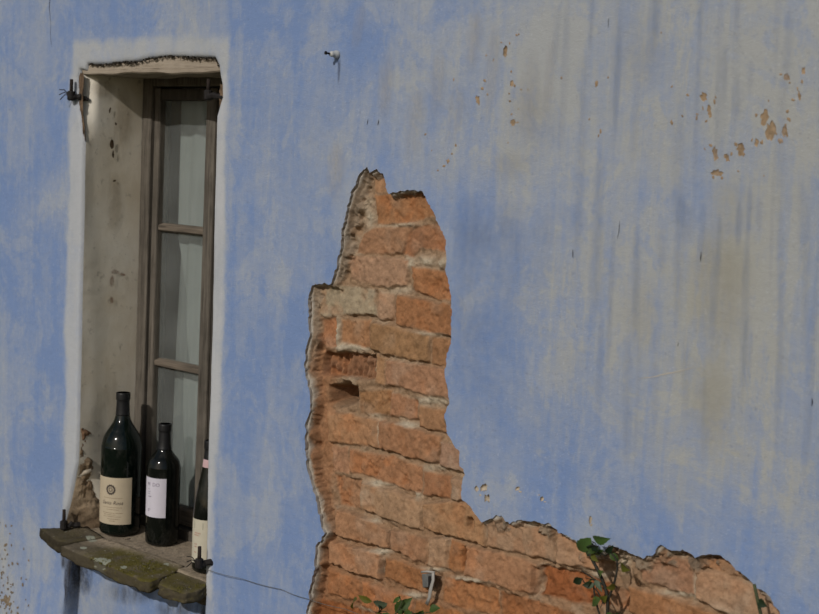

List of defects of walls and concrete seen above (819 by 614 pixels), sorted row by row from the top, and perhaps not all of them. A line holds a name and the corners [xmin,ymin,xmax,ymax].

peeling [695,92,716,123]
peeling [704,67,805,180]
spalling [304,167,780,614]
peeling [0,524,29,614]